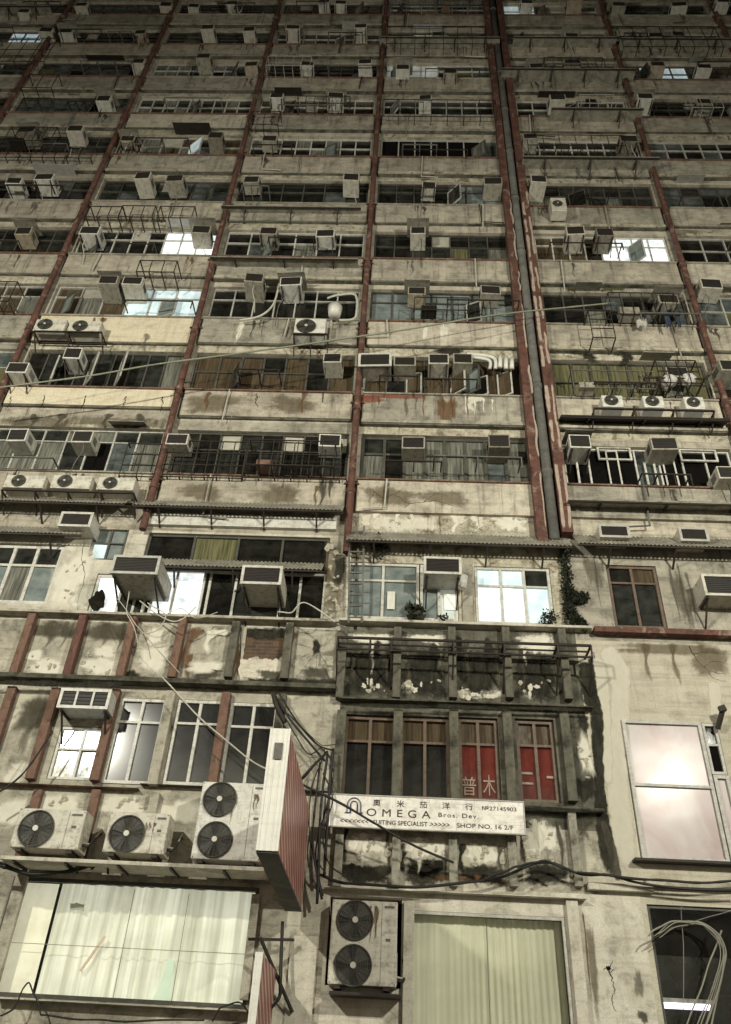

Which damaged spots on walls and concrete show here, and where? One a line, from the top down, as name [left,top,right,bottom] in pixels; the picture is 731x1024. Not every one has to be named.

rust [438,396,468,420]
leakage [319,480,333,504]
peeling [359,513,528,534]
flaking render [23,649,64,674]
flaking render [79,645,119,676]
spalling [187,627,285,681]
leakage [621,643,725,718]
flaking render [347,832,391,868]
flaking render [405,837,447,874]
flaking render [464,842,506,867]
flaking render [522,819,563,865]
crack [604,963,615,1010]